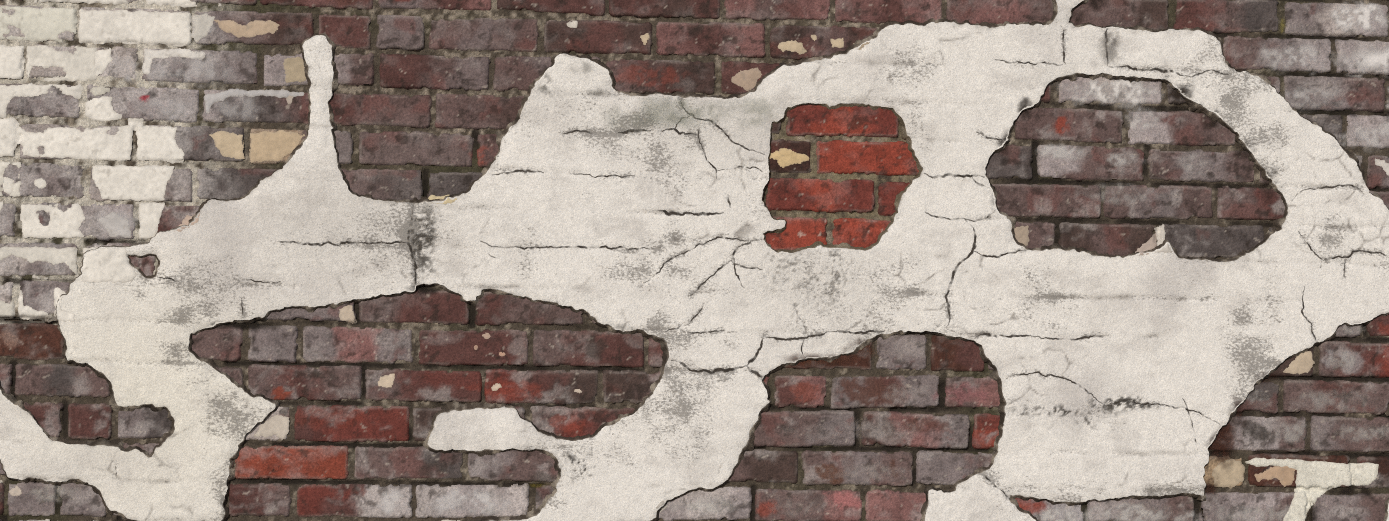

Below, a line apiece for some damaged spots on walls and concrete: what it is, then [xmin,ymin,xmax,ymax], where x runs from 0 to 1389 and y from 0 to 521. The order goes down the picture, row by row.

spalling [188,283,669,521]
spalling [0,0,1058,458]
crack [486,103,876,377]
spalling [651,330,1007,521]
crack [925,173,983,183]
crack [925,212,1094,340]
crack [1016,372,1202,442]
spalling [985,73,1288,262]
spalling [1009,312,1389,521]
spalling [1069,0,1389,210]
crack [1301,291,1316,340]
crack [1307,243,1385,270]